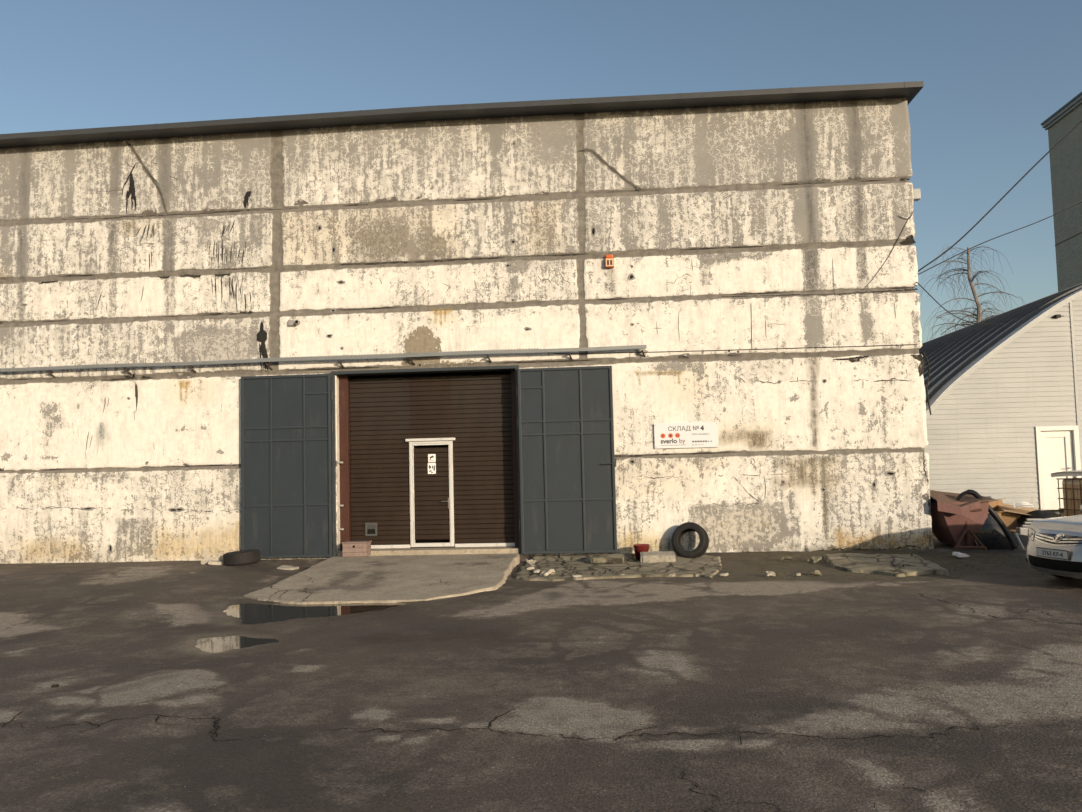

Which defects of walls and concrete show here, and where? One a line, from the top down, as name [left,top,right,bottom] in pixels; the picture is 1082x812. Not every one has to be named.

crack [125,140,176,213]
crack [578,148,643,191]
spalling [797,176,862,184]
peeling [99,208,264,247]
peeling [505,260,531,301]
spalling [762,287,918,296]
peeling [172,329,254,379]
peeling [399,325,480,368]
peeling [40,404,61,423]
peeling [686,494,788,550]
crack [1,710,261,741]
crack [320,710,1073,745]